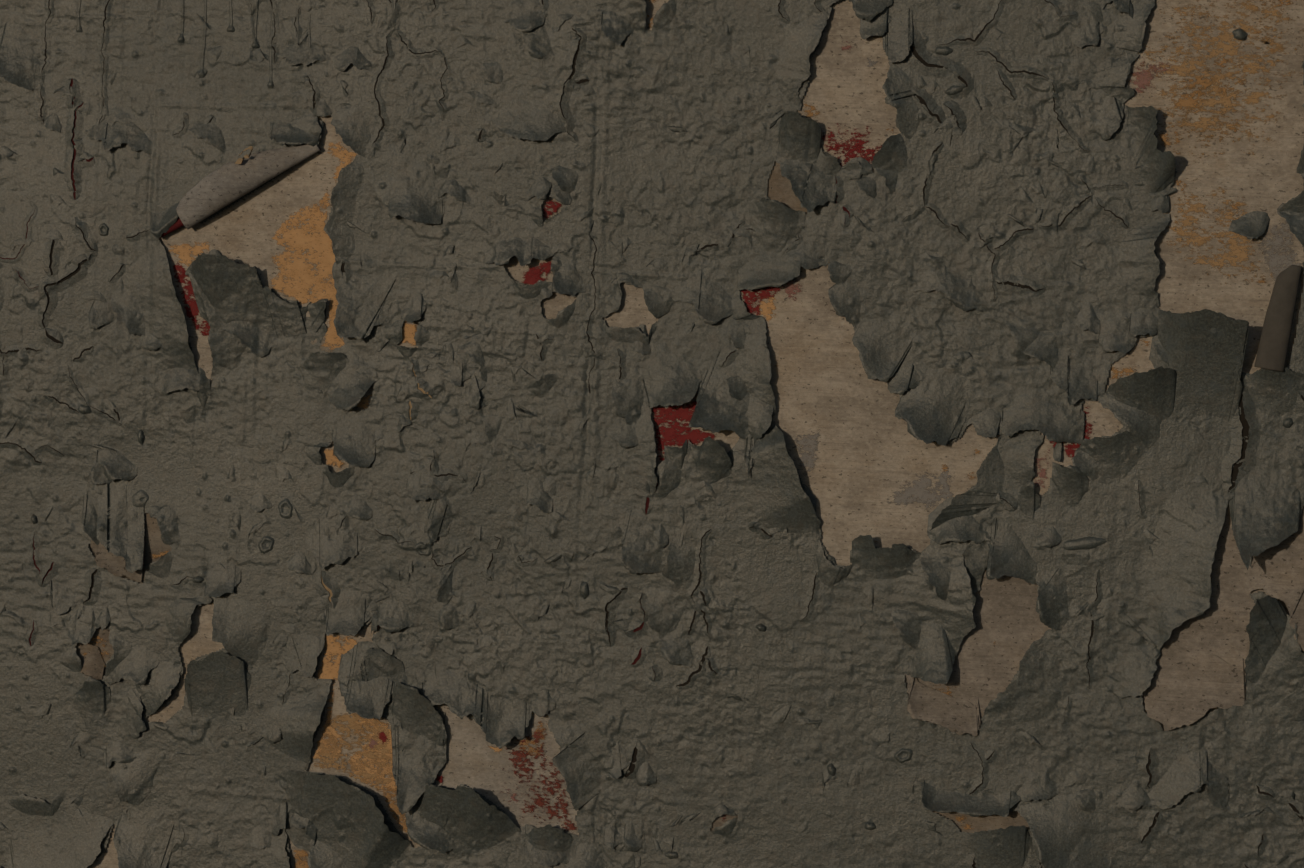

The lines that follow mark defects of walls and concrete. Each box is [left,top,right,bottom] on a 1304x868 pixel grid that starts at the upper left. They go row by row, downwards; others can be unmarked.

peeling [111,99,472,488]
peeling [602,0,1304,737]
crack [1221,372,1261,495]
peeling [81,445,181,584]
peeling [436,565,460,631]
peeling [1,556,273,868]
peeling [710,804,738,837]
peeling [921,771,1119,868]